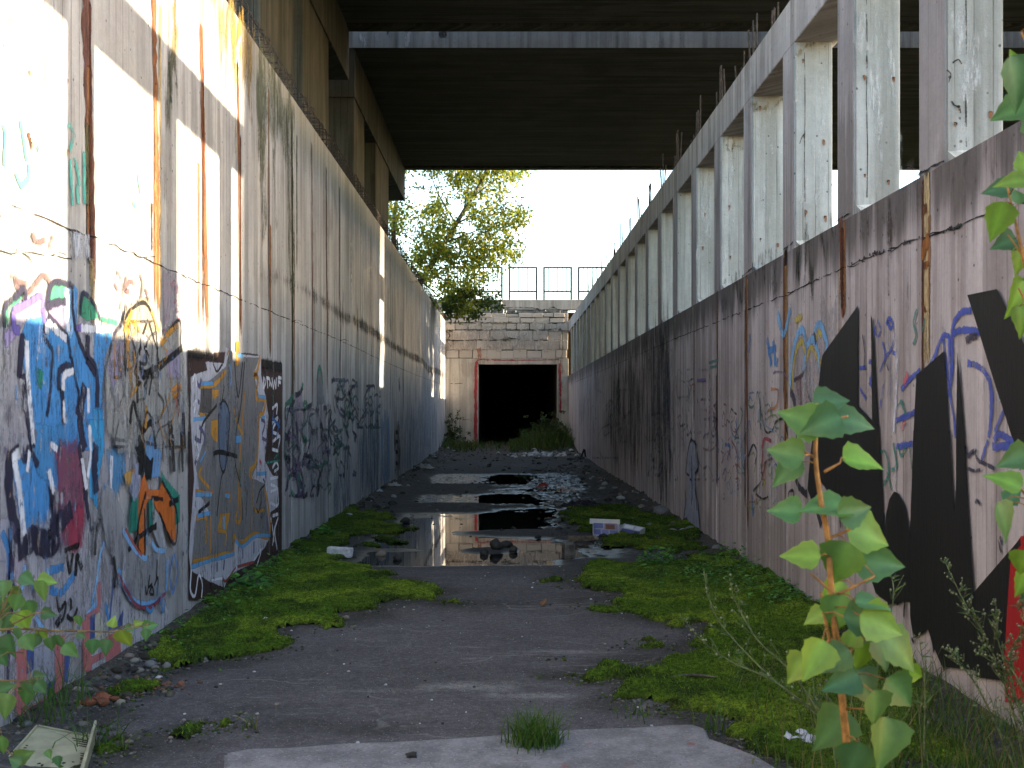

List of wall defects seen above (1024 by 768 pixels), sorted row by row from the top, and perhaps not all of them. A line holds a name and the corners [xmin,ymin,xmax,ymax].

rust [81,0,97,299]
rust [151,0,161,312]
rust [198,23,209,323]
crack [0,204,463,384]
crack [581,214,985,380]
rust [921,173,931,370]
damp [595,305,675,506]